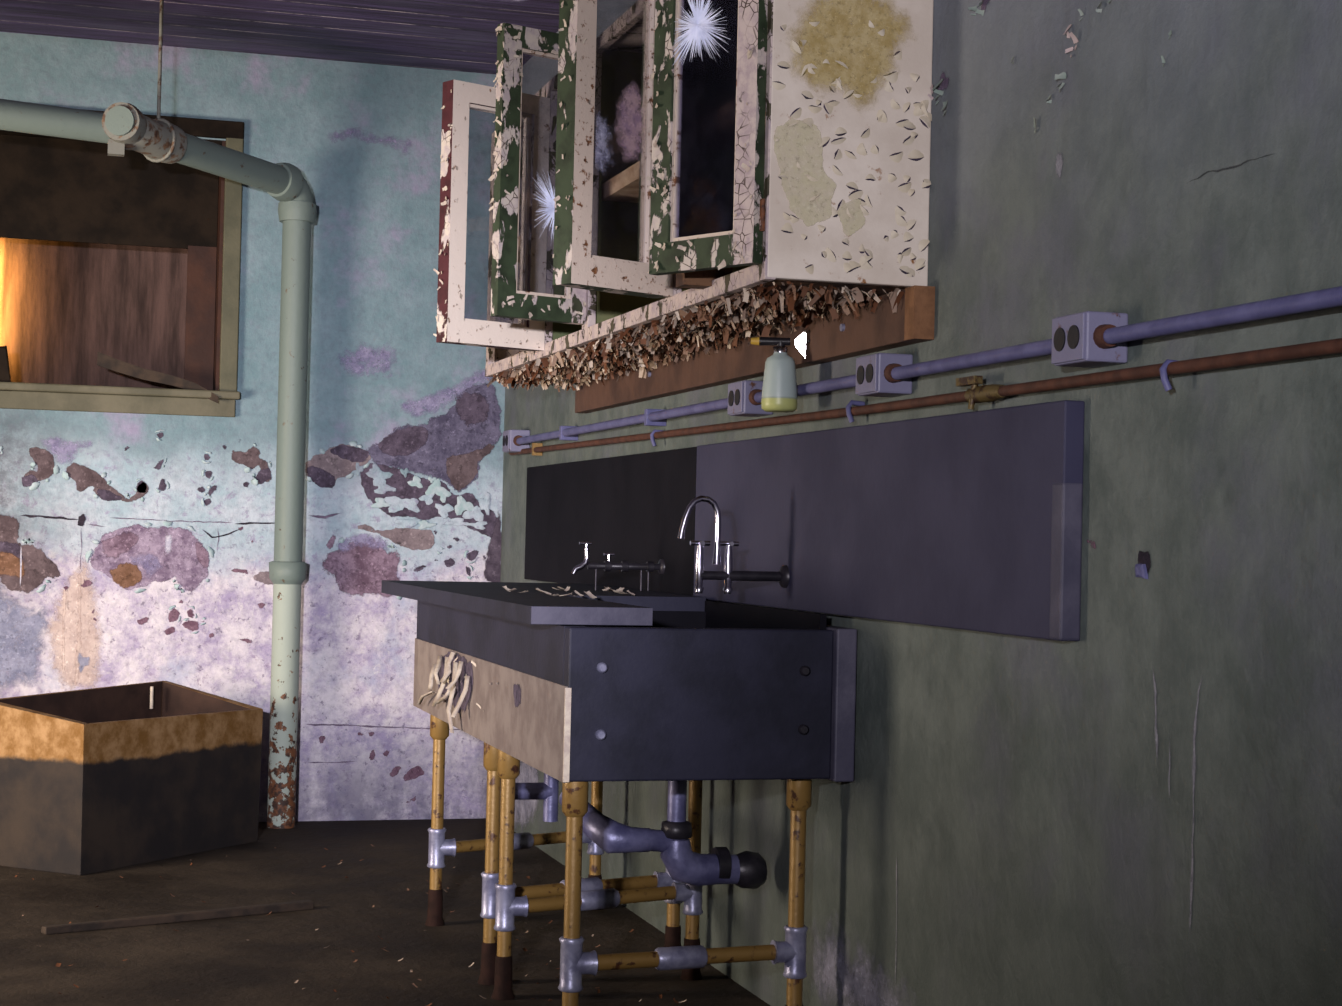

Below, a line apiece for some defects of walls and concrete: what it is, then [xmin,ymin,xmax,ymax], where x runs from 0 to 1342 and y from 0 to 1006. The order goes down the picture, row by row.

peeling [22,438,170,502]
peeling [197,439,272,506]
spalling [305,441,502,600]
peeling [85,520,215,638]
peeling [231,568,273,585]
leakage [0,597,47,686]